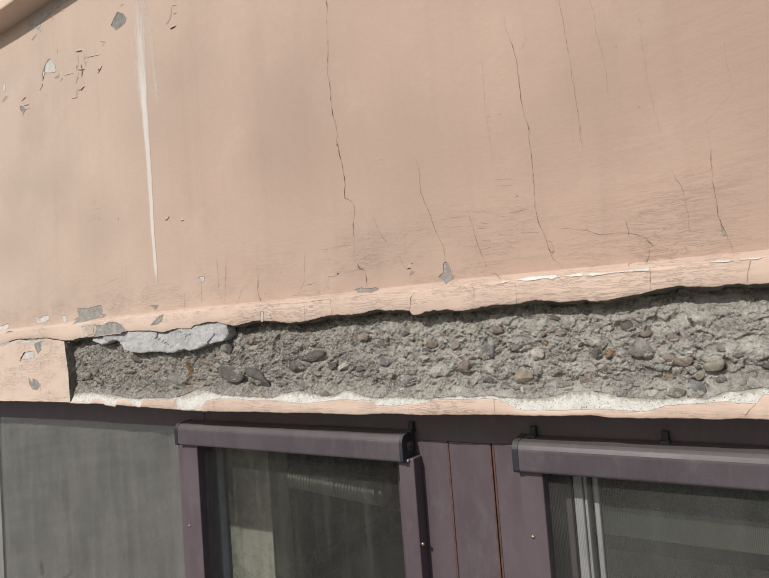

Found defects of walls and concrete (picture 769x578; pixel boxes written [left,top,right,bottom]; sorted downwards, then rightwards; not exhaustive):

peeling [28,0,69,40]
peeling [111,12,127,30]
peeling [42,49,63,81]
water stain [135,10,157,279]
spalling [502,267,649,283]
peeling [0,339,44,360]
spalling [62,287,769,412]